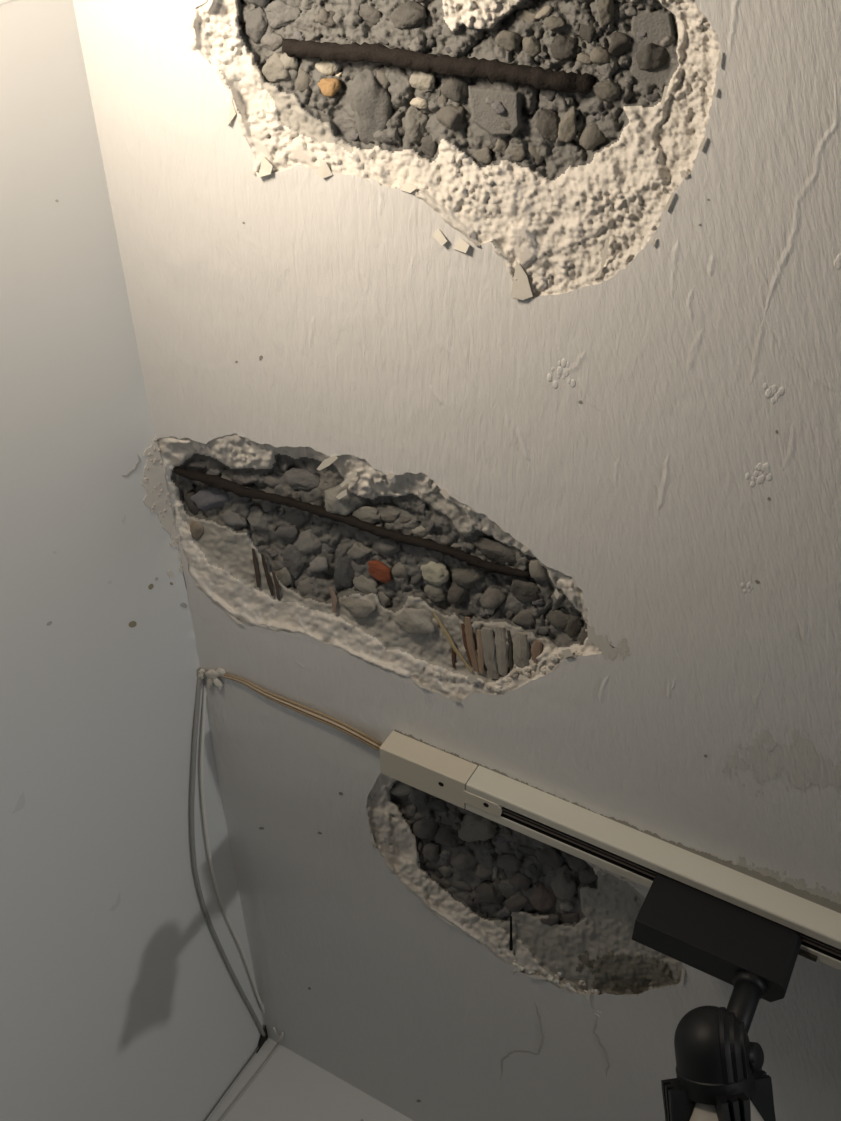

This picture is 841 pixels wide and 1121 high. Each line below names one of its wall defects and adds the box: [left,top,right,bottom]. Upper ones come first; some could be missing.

spalling [189,0,721,300]
spalling [122,433,615,703]
spalling [366,773,685,1001]